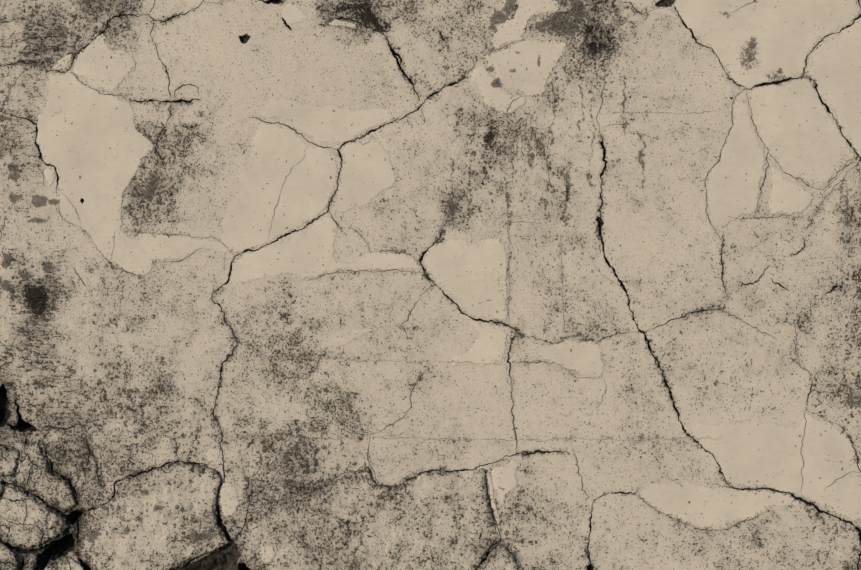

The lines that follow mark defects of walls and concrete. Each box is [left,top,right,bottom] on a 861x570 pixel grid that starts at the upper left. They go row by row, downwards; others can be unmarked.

damp [530,0,608,53]
crack [0,0,230,276]
crack [204,0,861,570]
flaking render [0,384,84,570]
peeling [85,529,101,543]
crack [0,413,208,570]
spalling [171,541,250,570]
flaking render [220,482,239,517]
flaking render [259,545,275,564]
flaking render [486,460,520,539]